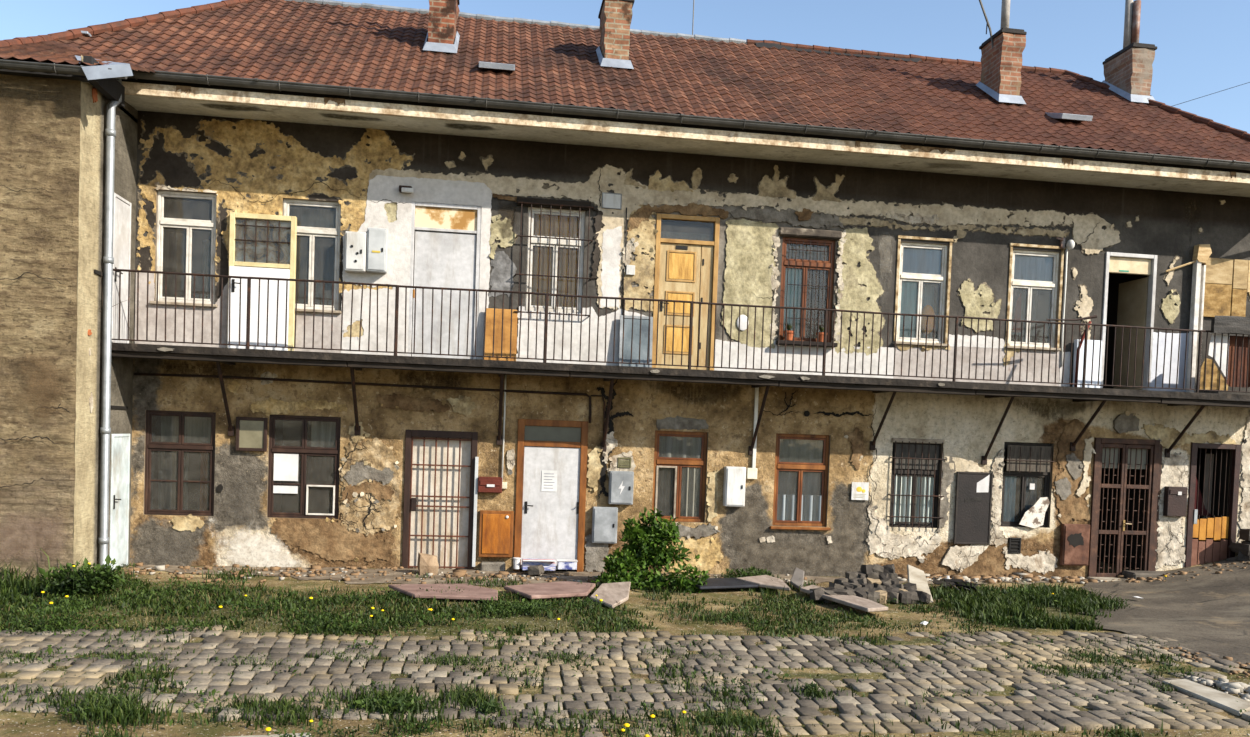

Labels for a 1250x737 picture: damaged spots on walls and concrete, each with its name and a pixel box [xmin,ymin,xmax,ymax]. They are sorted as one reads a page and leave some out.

flaking render [136,111,1140,352]
spalling [1003,343,1020,366]
spalling [1159,255,1181,325]
spalling [250,371,401,564]
spalling [866,447,1083,579]
spalling [1052,419,1096,524]